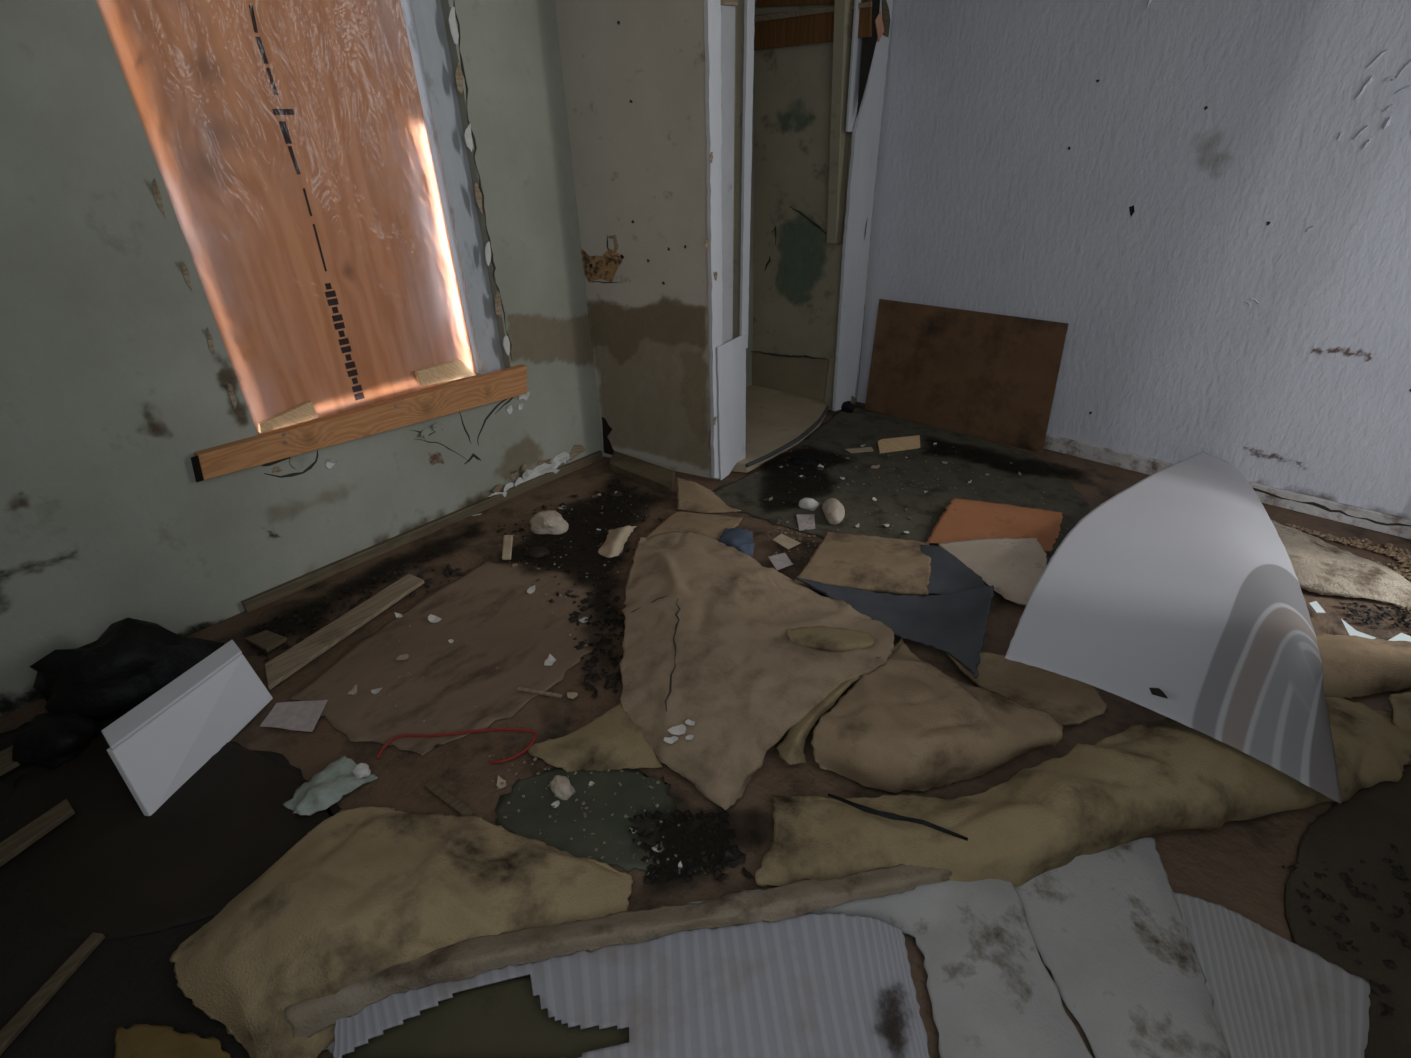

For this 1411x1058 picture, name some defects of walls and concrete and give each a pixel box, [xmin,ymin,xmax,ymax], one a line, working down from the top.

flaking render [448,0,512,360]
water stain [509,299,711,468]